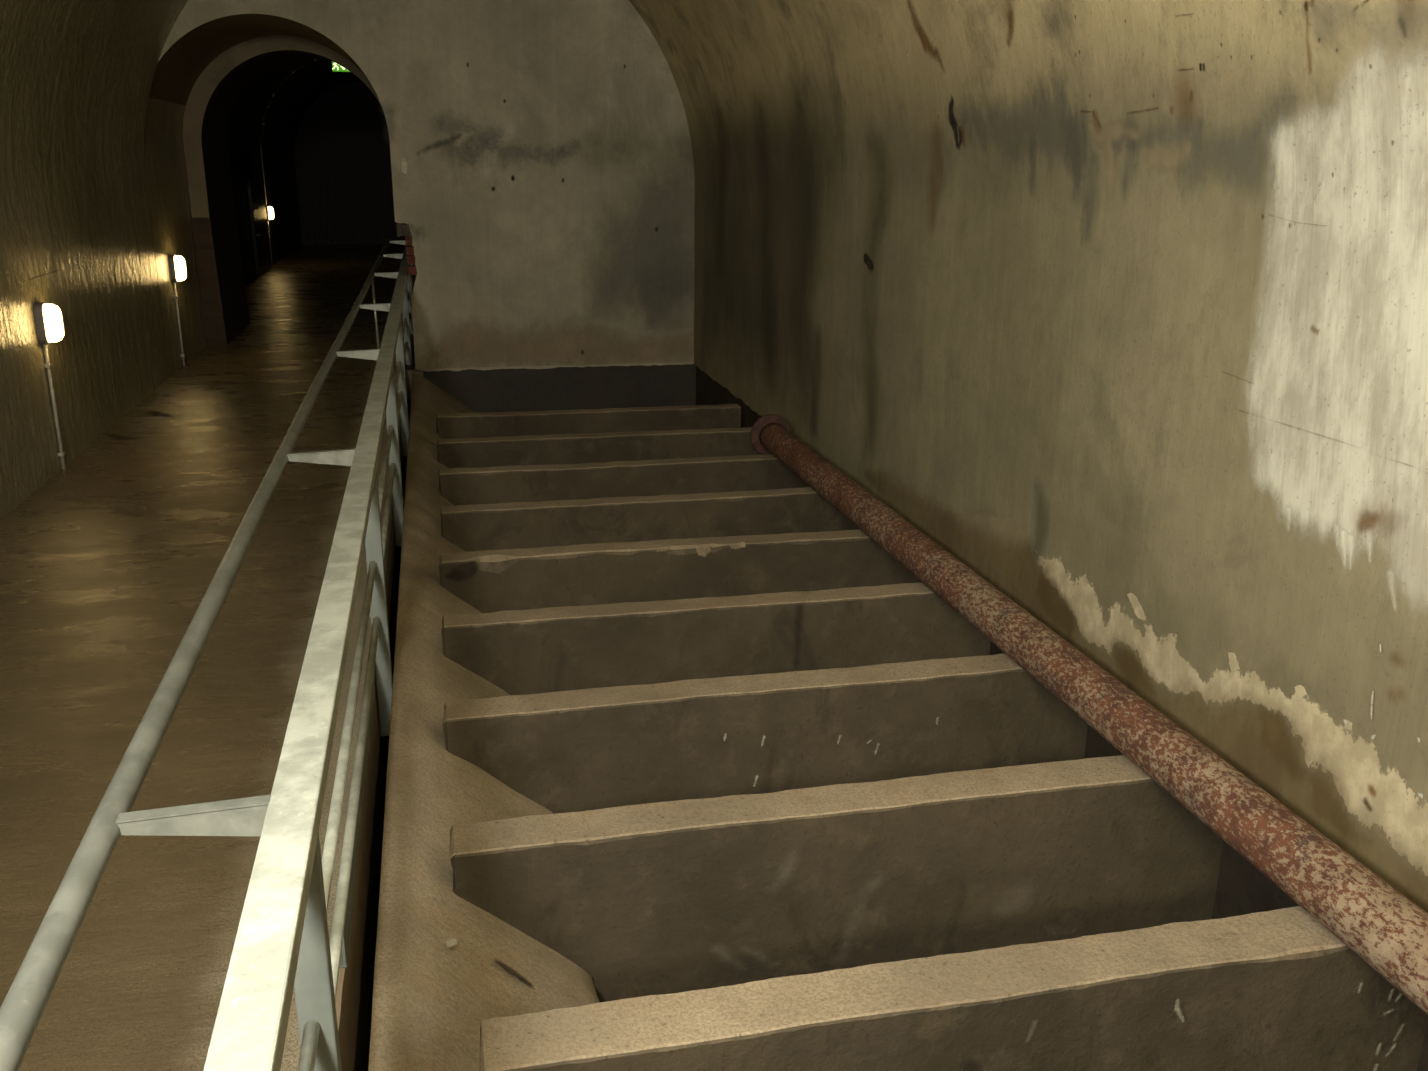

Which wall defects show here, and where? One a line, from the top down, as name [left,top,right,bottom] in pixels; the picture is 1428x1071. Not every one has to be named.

spalling [696,366,762,428]
peeling [946,512,1428,876]
spalling [1212,840,1300,919]